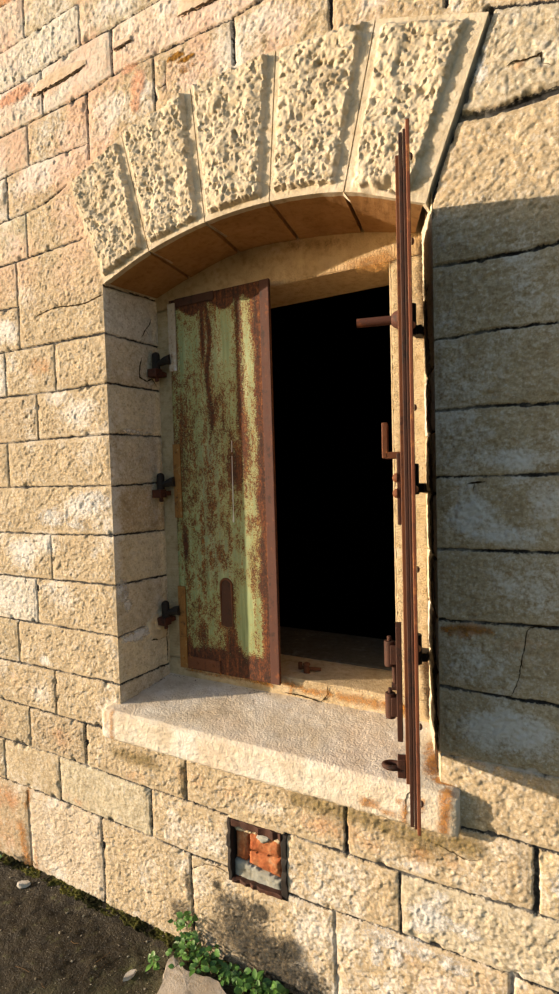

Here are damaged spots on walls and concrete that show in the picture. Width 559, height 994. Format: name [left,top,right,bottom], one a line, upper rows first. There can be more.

spalling [177,0,217,17]
crack [511,626,559,696]
rust [424,743,455,834]
leakage [206,880,327,994]